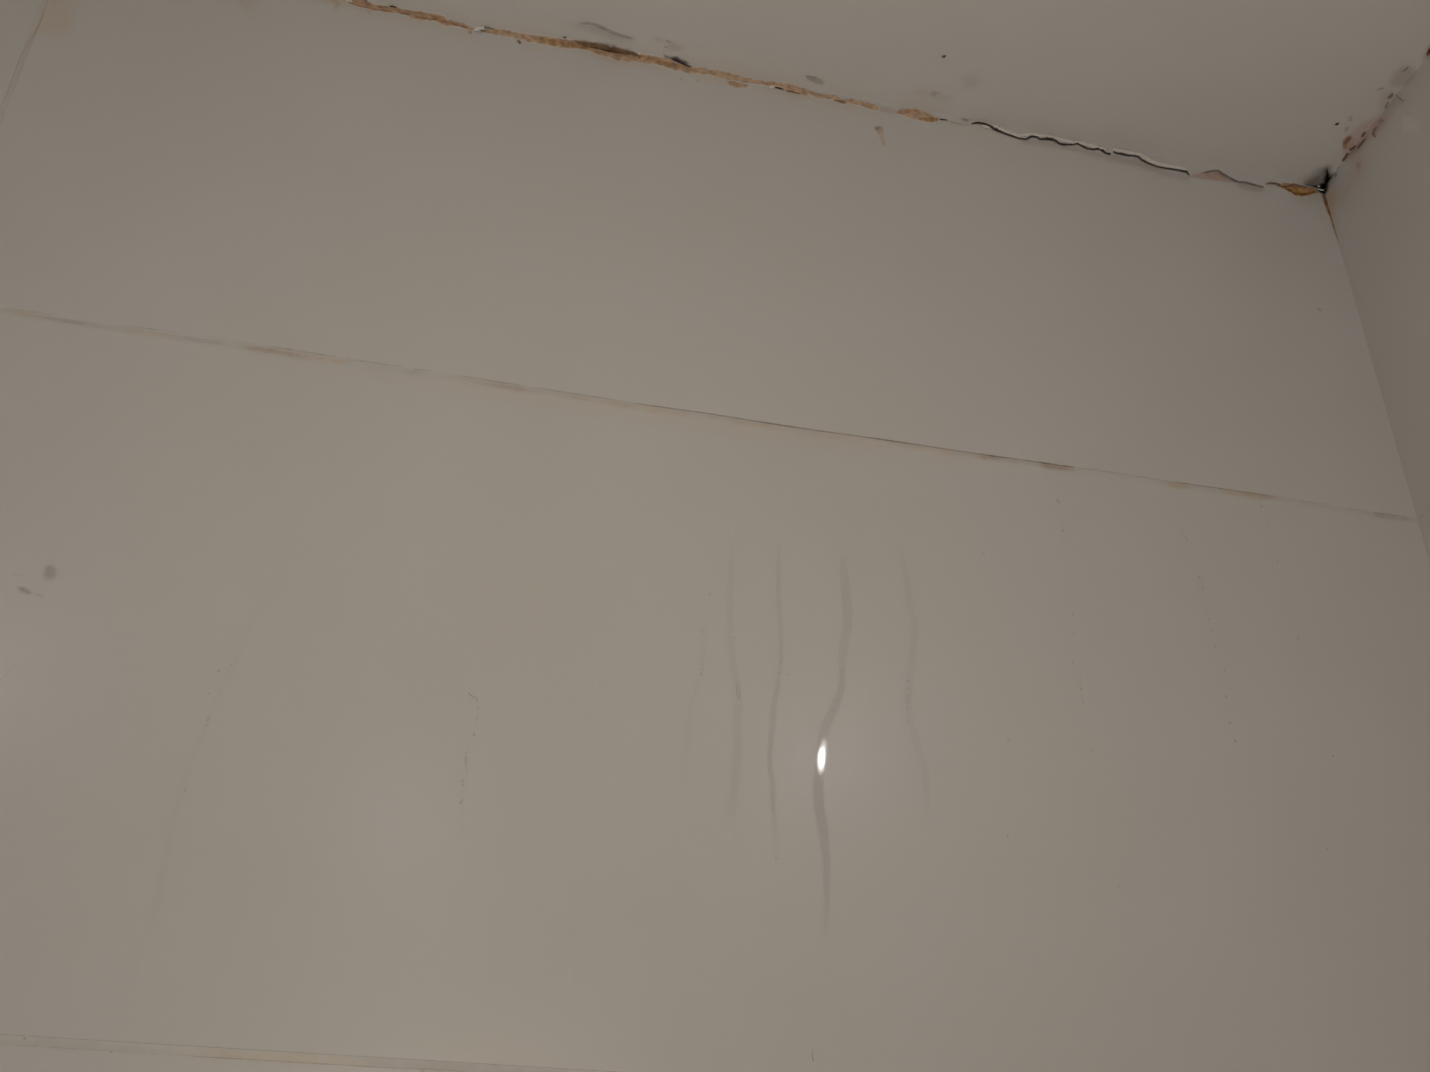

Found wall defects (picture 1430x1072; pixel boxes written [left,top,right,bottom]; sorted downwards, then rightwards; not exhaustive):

crack [971,120,1281,188]
water stain [812,529,854,964]